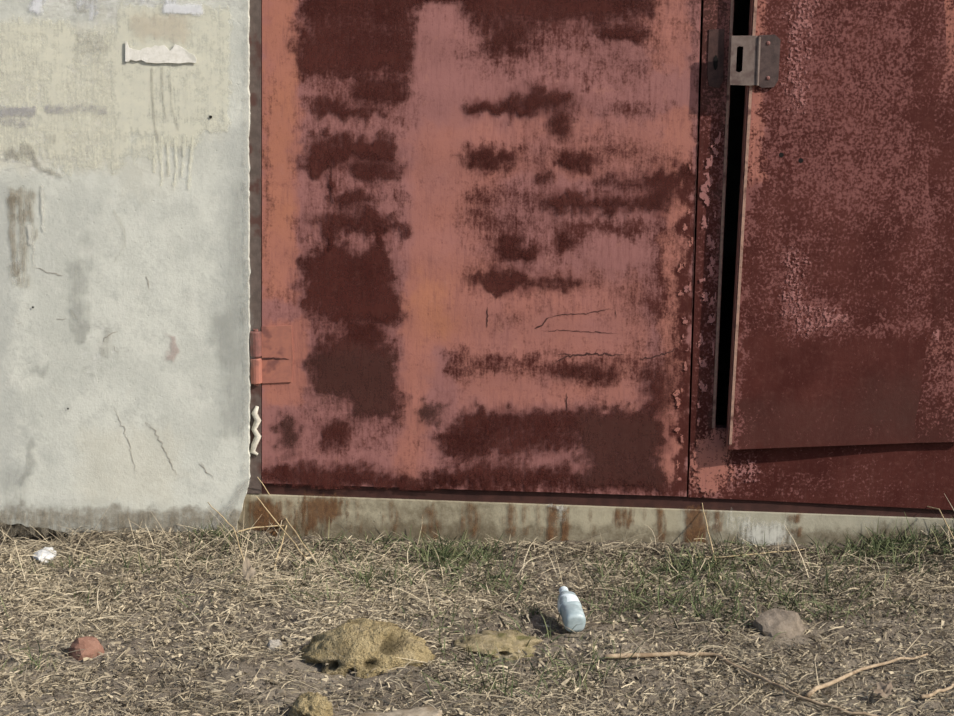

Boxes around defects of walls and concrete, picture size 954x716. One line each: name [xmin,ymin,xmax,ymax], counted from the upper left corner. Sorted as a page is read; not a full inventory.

crack [115,411,177,475]
rust [249,494,343,537]
rust [548,505,569,542]
rust [615,509,634,527]
rust [685,506,723,543]